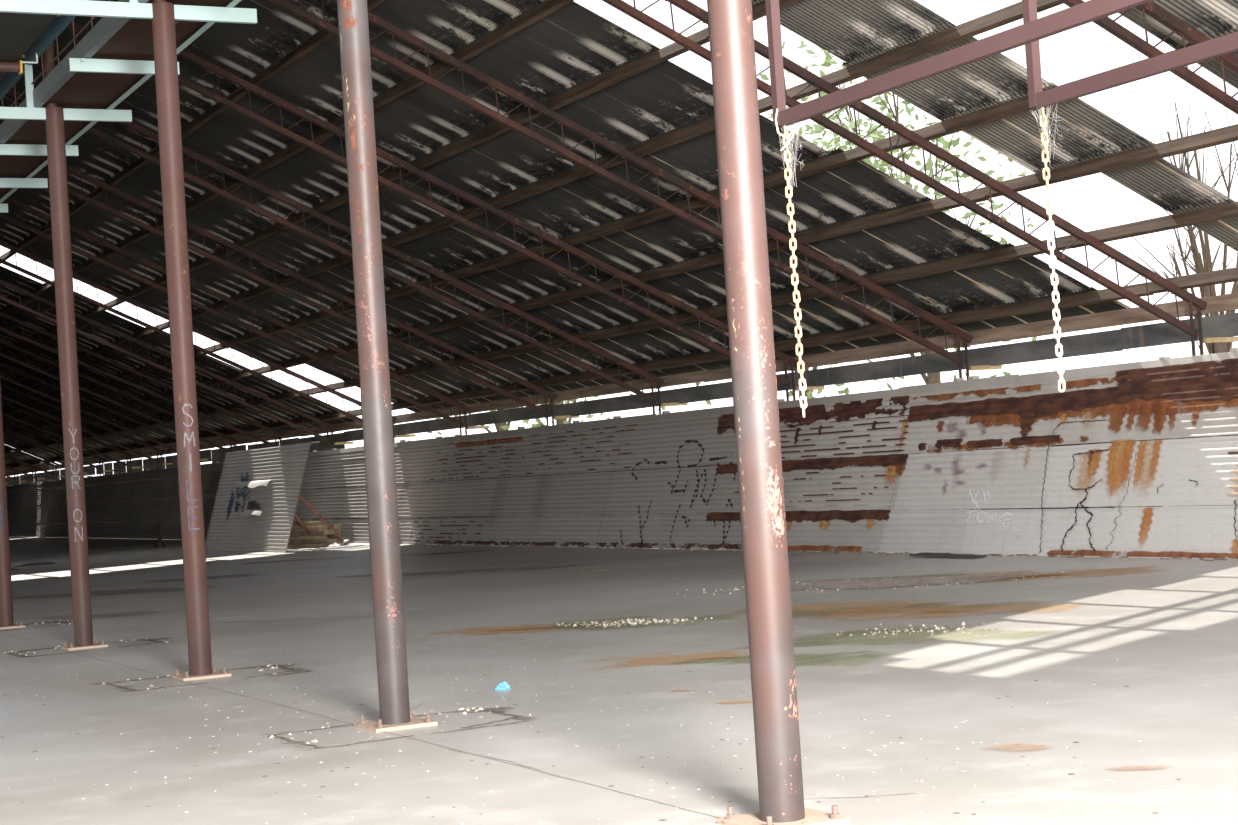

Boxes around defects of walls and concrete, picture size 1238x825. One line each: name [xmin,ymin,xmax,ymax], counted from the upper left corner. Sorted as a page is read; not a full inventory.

rust [717,414,735,435]
rust [716,464,737,474]
rust [778,358,1238,530]
rust [706,512,741,521]
rust [972,508,1238,580]
crack [383,702,721,818]